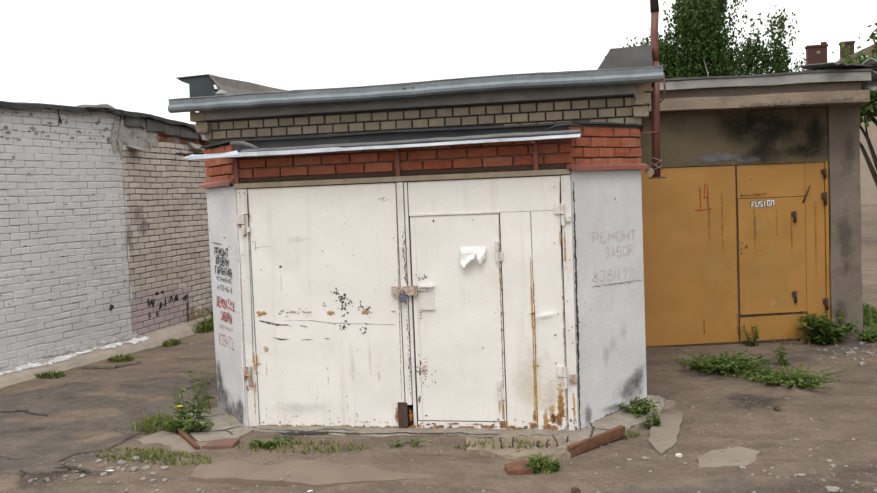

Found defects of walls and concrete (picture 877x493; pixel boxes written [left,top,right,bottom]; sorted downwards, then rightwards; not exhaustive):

spalling [153,132,209,152]
leakage [701,116,794,162]
peeling [323,288,370,334]
corrosion [434,258,576,430]
corrosion [244,347,268,413]